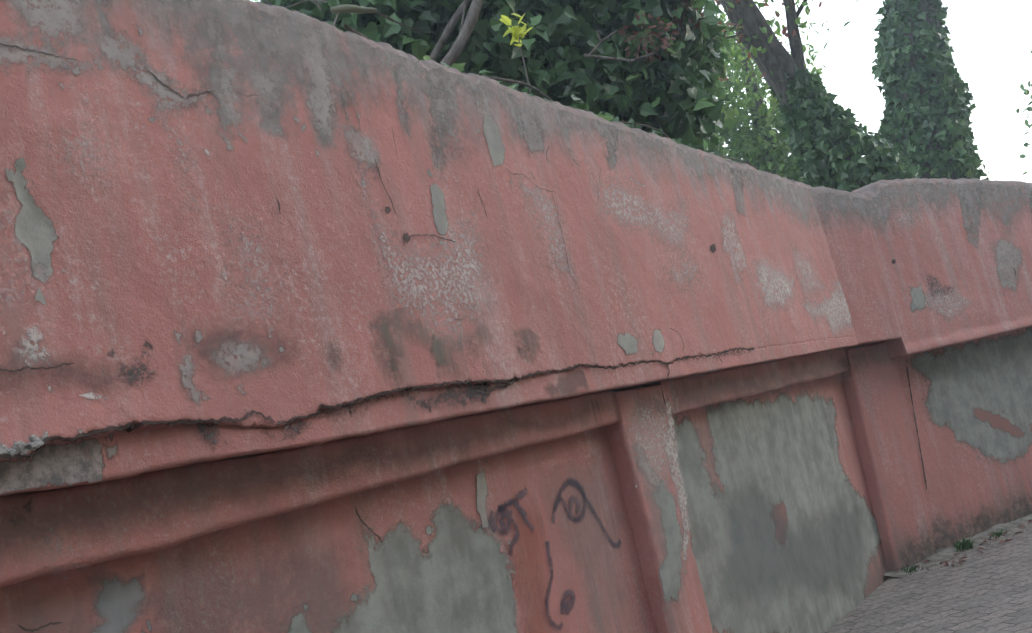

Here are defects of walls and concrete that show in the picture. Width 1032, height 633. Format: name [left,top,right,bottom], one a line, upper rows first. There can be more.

crack [0,43,79,61]
crack [145,67,259,100]
water stain [176,0,358,145]
water stain [374,47,1032,248]
spalling [2,158,65,305]
peeling [373,169,486,341]
spalling [0,429,117,493]
crack [0,328,755,459]
peeling [333,460,517,633]
peeling [653,391,881,633]
crack [906,366,927,490]
peeling [906,327,1032,463]